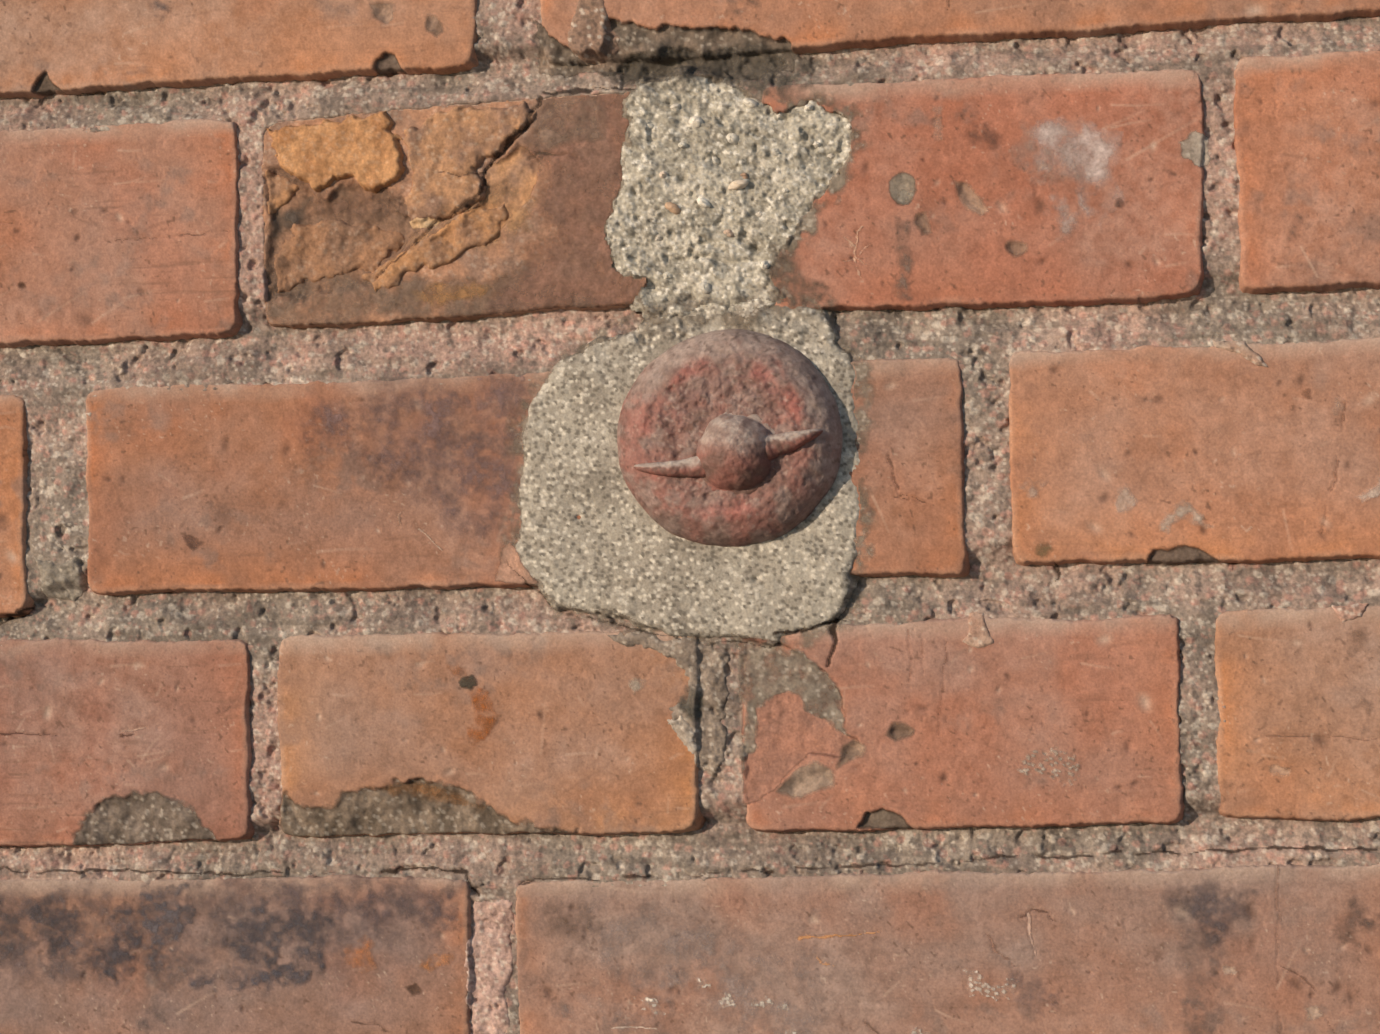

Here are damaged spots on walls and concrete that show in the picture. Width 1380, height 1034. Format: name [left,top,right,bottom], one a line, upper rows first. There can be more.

peeling [375,53,406,76]
spalling [427,16,442,36]
spalling [533,0,795,78]
spalling [262,92,647,326]
crack [377,86,634,278]
peeling [667,715,701,754]
spalling [738,636,864,804]
spalling [73,791,216,845]
spalling [280,778,567,837]